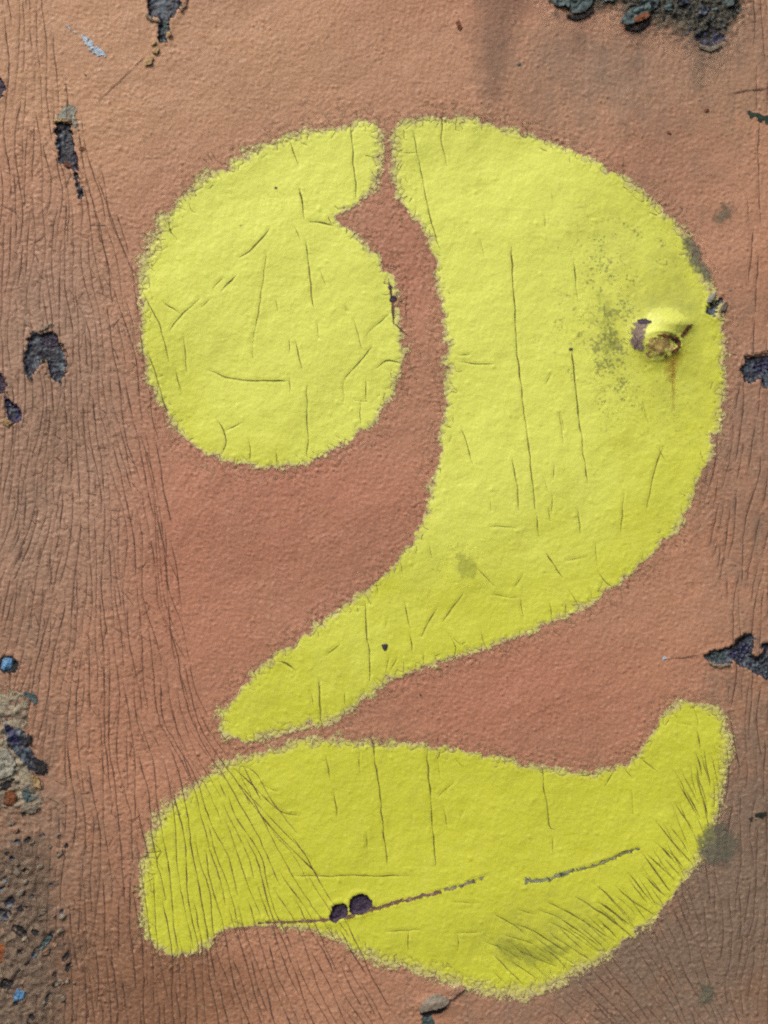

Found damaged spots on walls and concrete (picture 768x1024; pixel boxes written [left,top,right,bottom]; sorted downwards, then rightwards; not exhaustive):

peeling [144,0,187,66]
peeling [548,0,741,52]
peeling [53,104,85,199]
peeling [23,322,69,385]
peeling [740,351,768,388]
peeling [704,633,768,680]
peeling [0,686,48,814]
crack [374,760,383,823]
spalling [257,876,484,924]